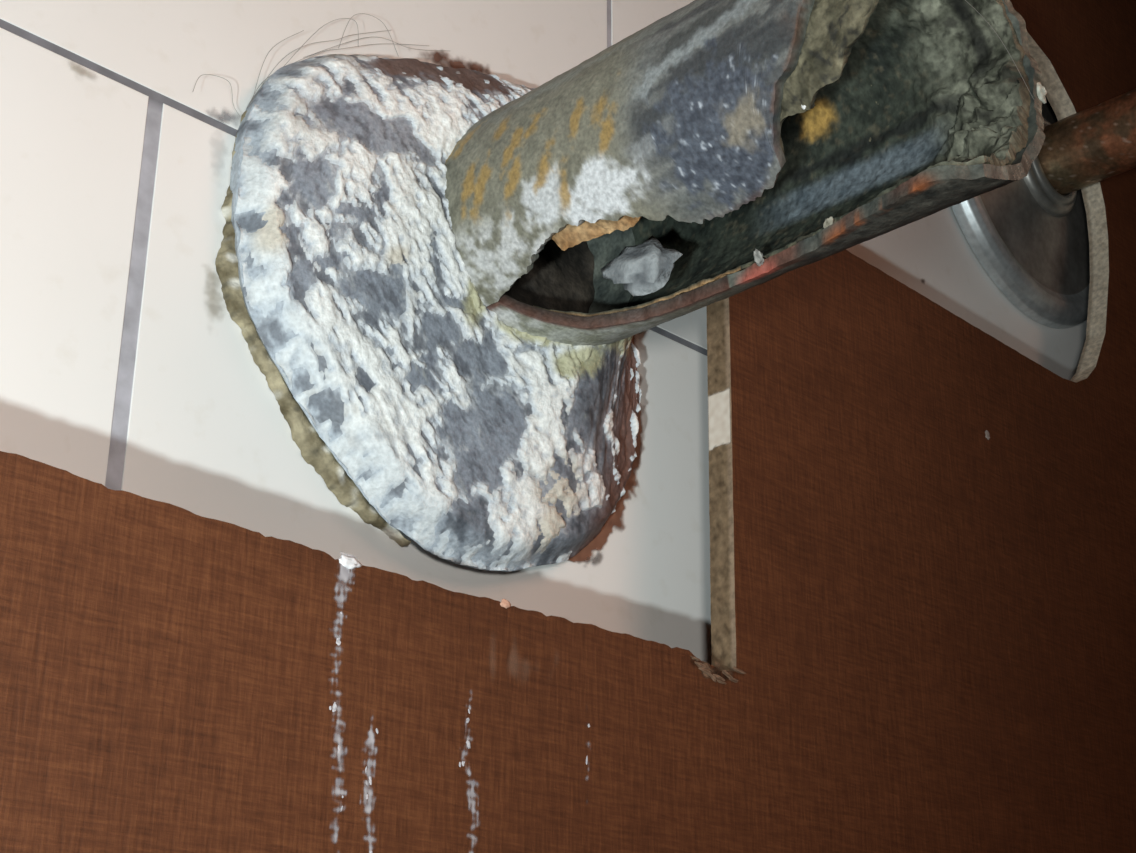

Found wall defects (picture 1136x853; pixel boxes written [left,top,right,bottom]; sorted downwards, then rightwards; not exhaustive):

damp [335,553,355,650]
damp [329,692,347,811]
damp [364,728,378,853]
damp [459,737,478,853]